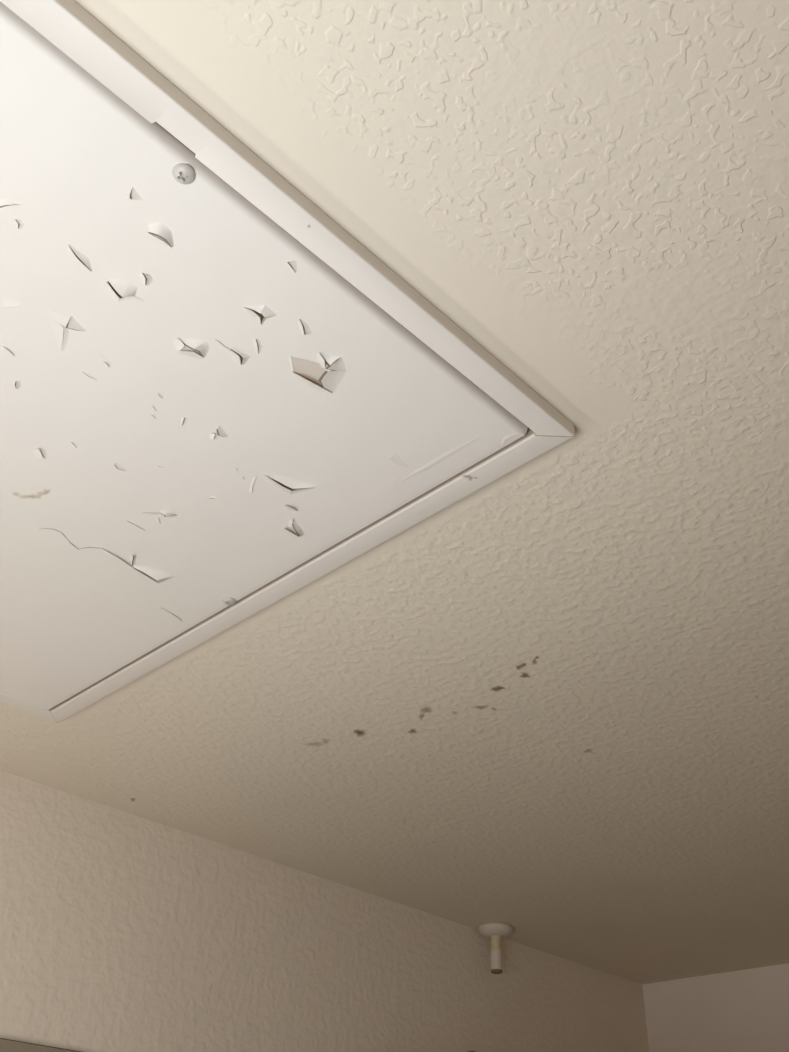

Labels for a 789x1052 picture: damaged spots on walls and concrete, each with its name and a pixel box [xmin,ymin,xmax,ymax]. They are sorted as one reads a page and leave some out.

peeling [124,187,143,201]
peeling [147,222,174,249]
peeling [66,244,92,272]
peeling [104,272,153,303]
peeling [43,308,86,351]
peeling [242,305,277,325]
peeling [297,319,312,336]
peeling [173,337,262,365]
peeling [289,352,346,394]
peeling [234,468,316,538]
crack [43,528,104,552]
peeling [101,549,176,583]